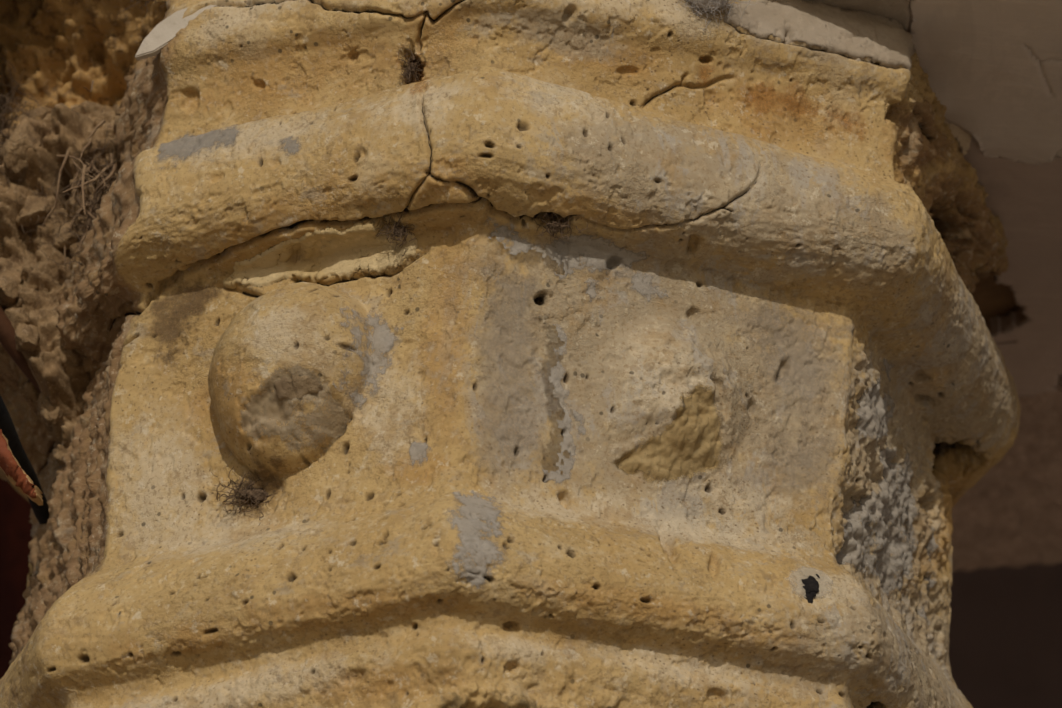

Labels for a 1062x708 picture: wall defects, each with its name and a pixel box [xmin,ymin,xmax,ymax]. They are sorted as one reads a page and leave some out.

peeling [135,5,218,61]
crack [222,0,465,39]
crack [726,22,904,68]
peeling [909,0,1062,165]
crack [260,106,576,237]
crack [296,254,425,286]
crack [110,312,142,330]